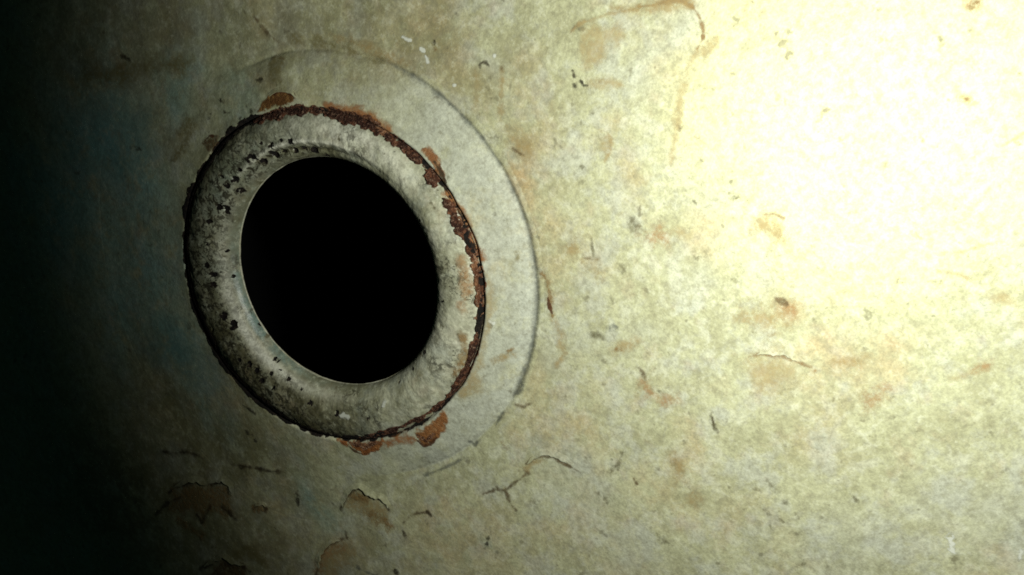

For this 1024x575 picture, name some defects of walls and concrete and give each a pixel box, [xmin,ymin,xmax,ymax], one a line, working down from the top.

rust [182,87,487,455]
peeling [339,483,407,536]
crack [487,449,574,510]